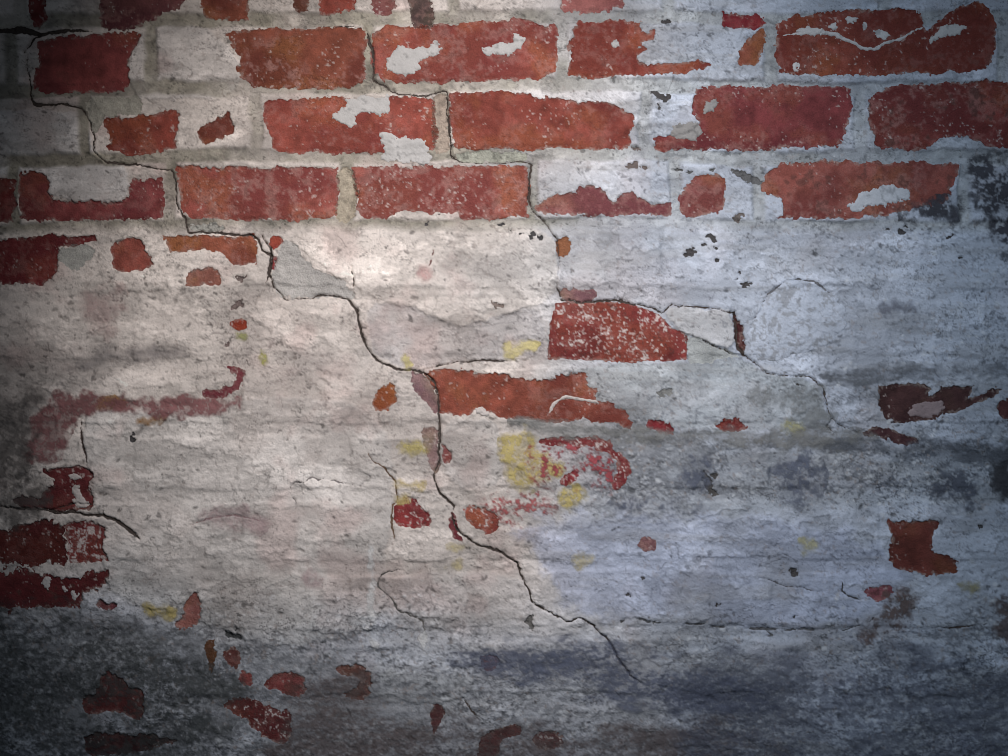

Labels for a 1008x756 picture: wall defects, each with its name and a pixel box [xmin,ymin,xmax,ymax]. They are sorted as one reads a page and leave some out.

peeling [33,0,185,156]
peeling [162,0,1008,283]
crack [0,26,641,683]
peeling [411,287,688,430]
crack [557,278,849,431]
peeling [863,382,1008,446]
peeling [0,465,117,615]
damp [860,587,915,645]
peeling [886,518,959,577]
damp [993,595,1008,641]
damp [0,625,243,756]
damp [266,641,778,756]